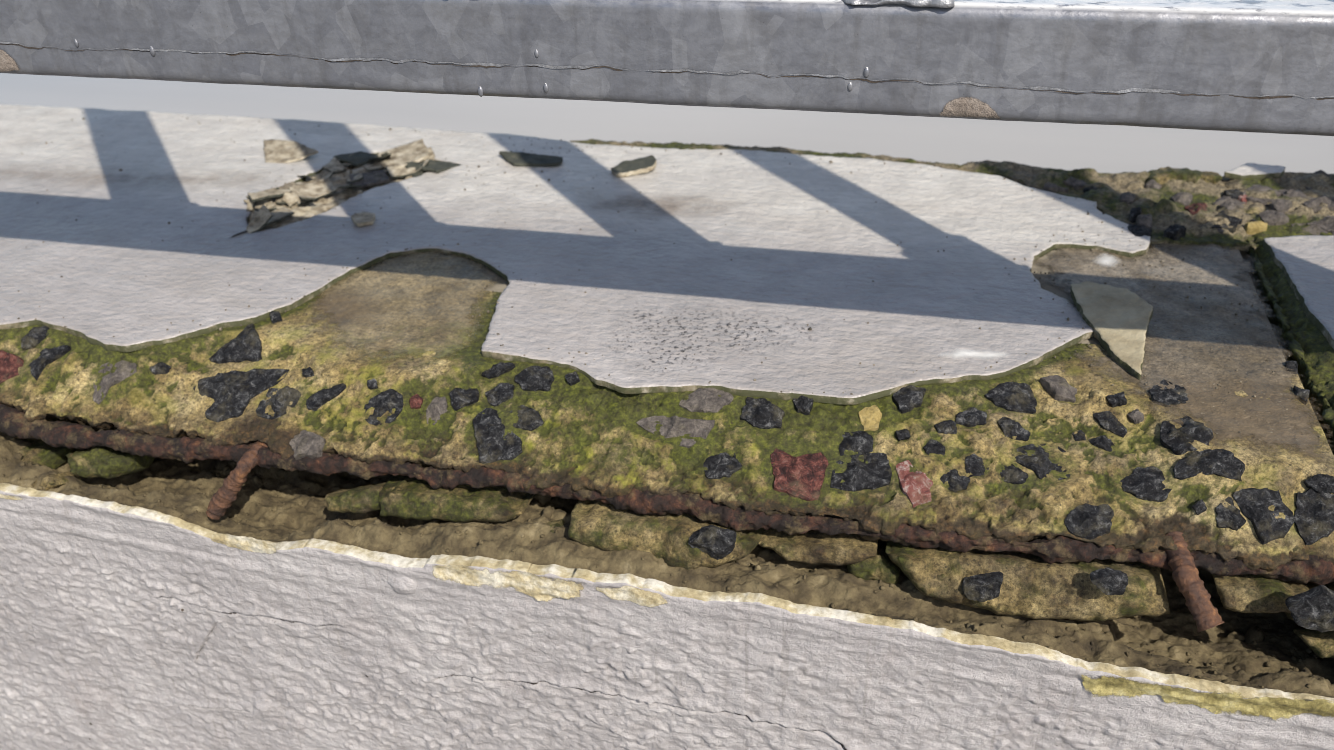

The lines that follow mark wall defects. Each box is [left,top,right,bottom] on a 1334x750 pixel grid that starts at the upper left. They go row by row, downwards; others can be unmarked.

corrosion [0,50,19,72]
corrosion [940,97,999,119]
spalling [0,139,1334,632]
flaking render [1081,675,1334,721]